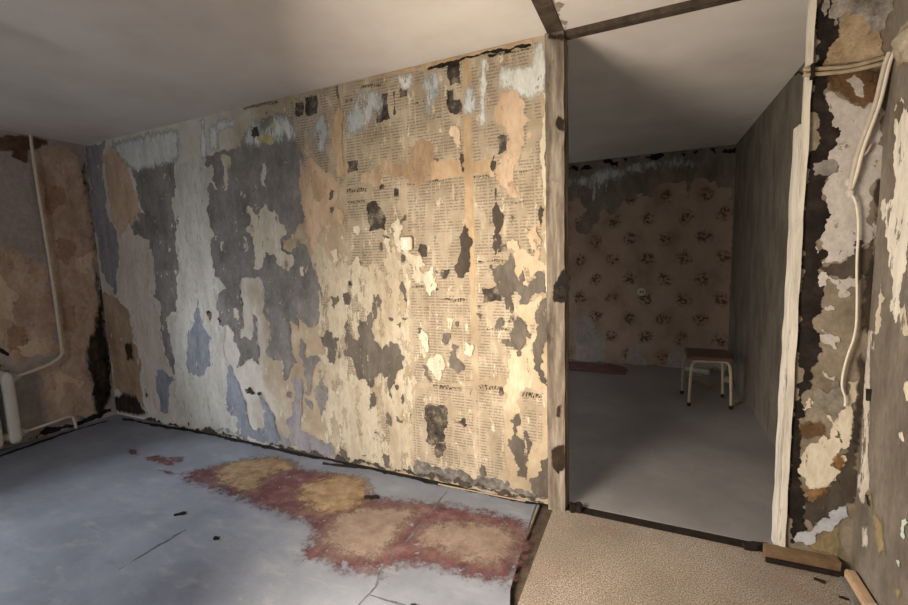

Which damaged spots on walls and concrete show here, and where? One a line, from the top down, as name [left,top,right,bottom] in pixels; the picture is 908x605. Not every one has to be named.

flaking render [894,100,904,124]
flaking render [813,152,839,176]
flaking render [55,141,120,295]
flaking render [815,237,876,298]
peeling [0,275,50,357]
flaking render [128,111,548,582]
peeling [817,328,840,349]
peeling [874,284,908,336]
flaking render [803,371,860,528]